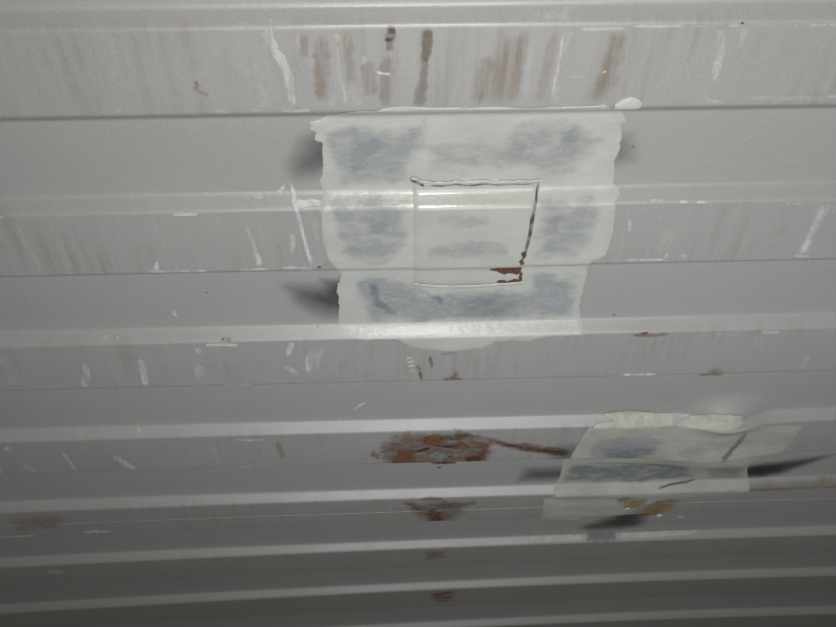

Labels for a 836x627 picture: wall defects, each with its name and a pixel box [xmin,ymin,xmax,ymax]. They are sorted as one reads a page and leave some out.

damp [422,31,432,60]
rust [490,252,527,283]
rust [384,435,489,468]